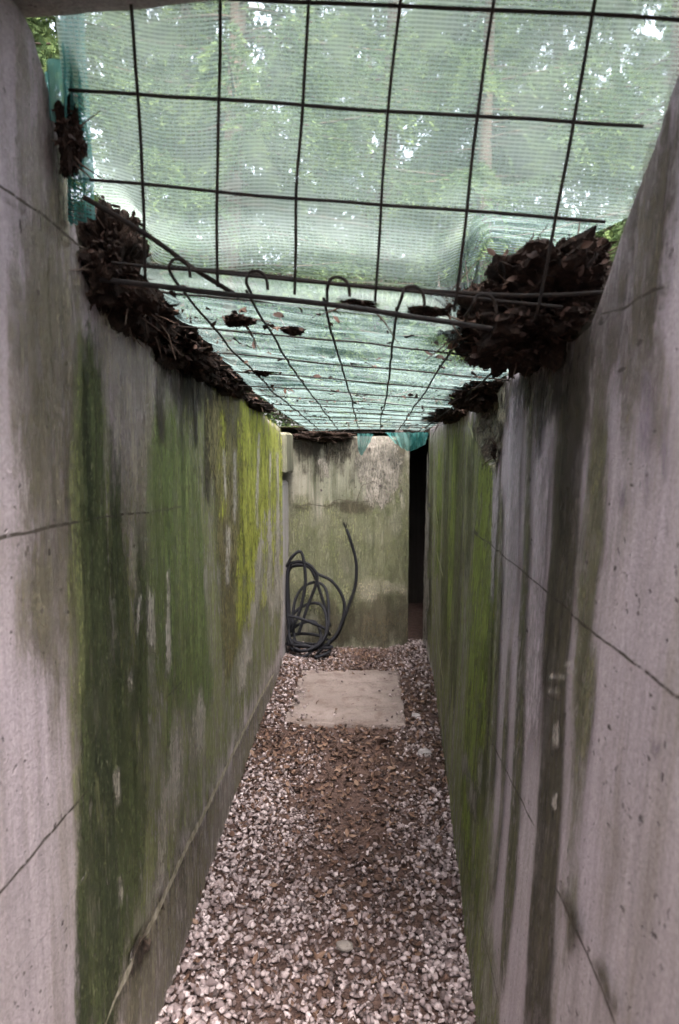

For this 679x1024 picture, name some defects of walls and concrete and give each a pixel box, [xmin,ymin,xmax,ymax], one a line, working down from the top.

crack [0,506,184,540]
leakage [109,427,149,850]
leakage [156,364,212,794]
leakage [298,443,358,483]
leakage [315,438,409,649]
leakage [428,428,474,663]
leakage [460,108,678,1024]
crack [473,480,679,700]
crack [0,791,87,894]
leakage [113,660,281,1024]